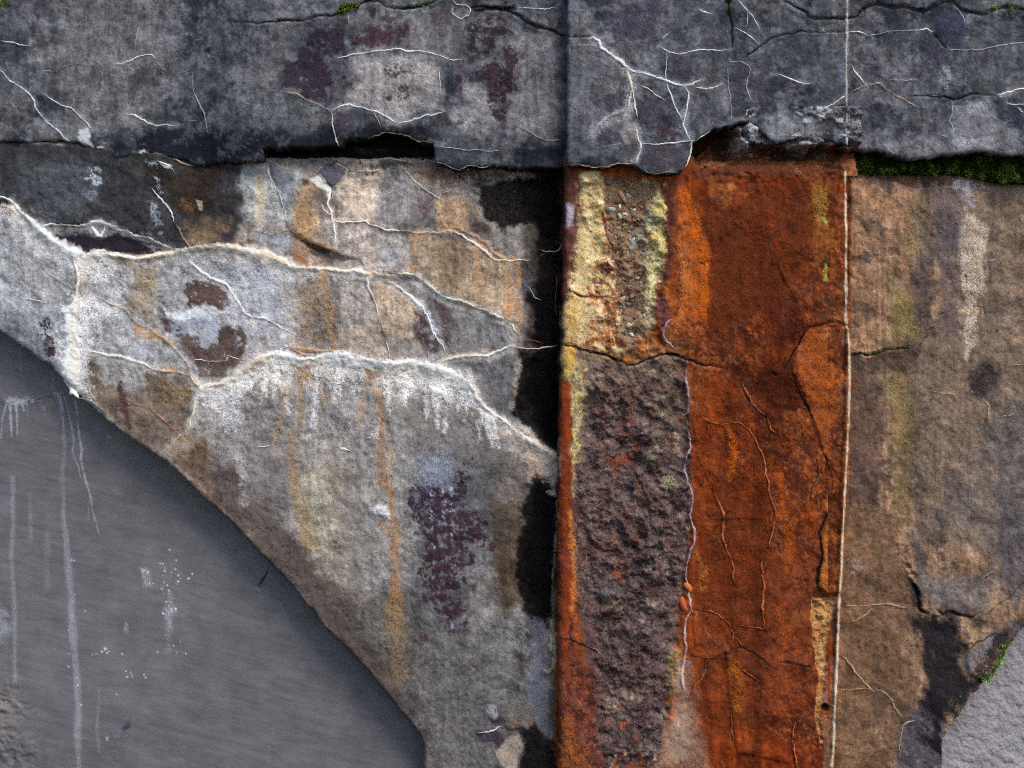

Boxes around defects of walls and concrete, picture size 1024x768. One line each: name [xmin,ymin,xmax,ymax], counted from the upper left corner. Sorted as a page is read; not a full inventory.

crack [237,0,1024,174]
crack [0,32,562,458]
damp [649,201,667,294]
damp [0,167,607,768]
rust [561,342,577,660]
crack [565,320,812,693]
rust [691,374,792,649]
crack [768,323,828,585]
rust [800,329,829,439]
rust [819,497,828,594]
crack [848,581,1024,647]